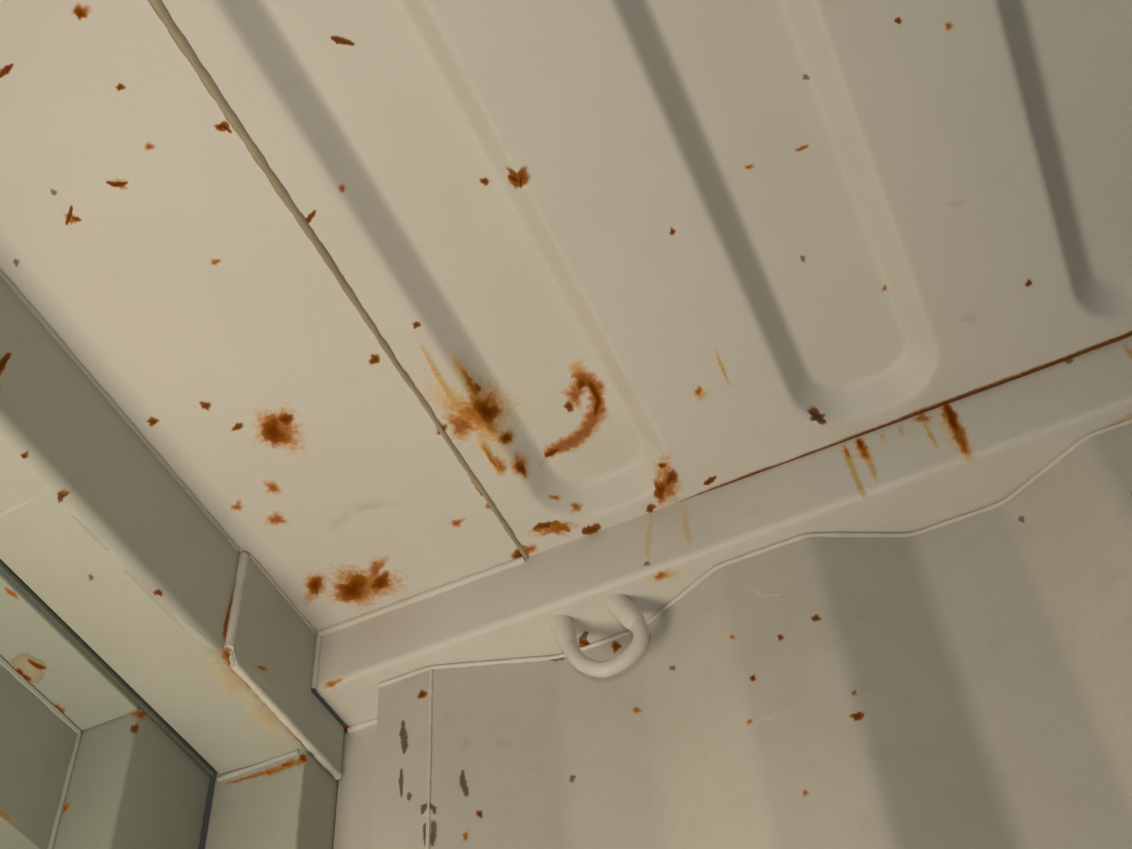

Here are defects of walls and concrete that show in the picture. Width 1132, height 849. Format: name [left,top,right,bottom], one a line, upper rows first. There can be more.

corrosion [261,412,297,447]
corrosion [437,369,513,444]
corrosion [544,369,606,458]
corrosion [646,331,1132,513]
corrosion [483,446,527,477]
corrosion [512,521,601,559]
corrosion [307,561,392,602]
corrosion [223,590,234,668]
corrosion [227,731,308,784]